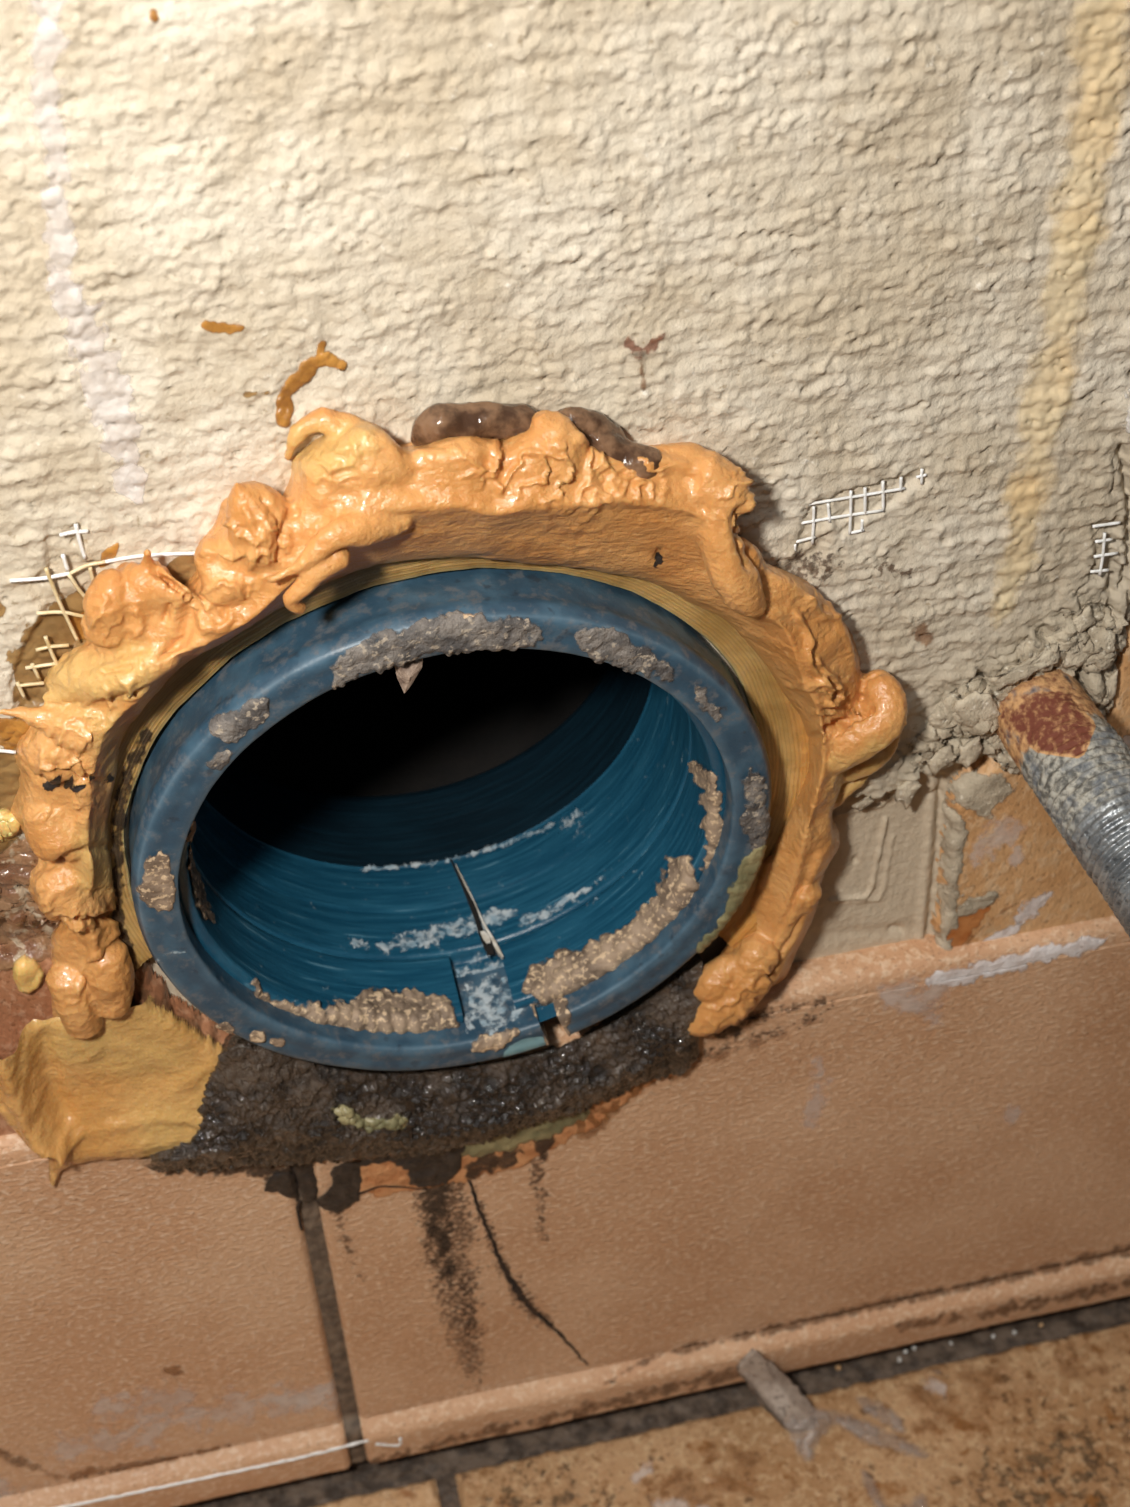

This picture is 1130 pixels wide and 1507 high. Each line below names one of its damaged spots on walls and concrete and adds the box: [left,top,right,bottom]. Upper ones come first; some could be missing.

spalling [851,796,875,811]
spalling [895,595,1130,810]
crack [356,1185,428,1196]
leakage [413,1181,488,1383]
leakage [530,1159,548,1241]
crack [467,1179,615,1383]